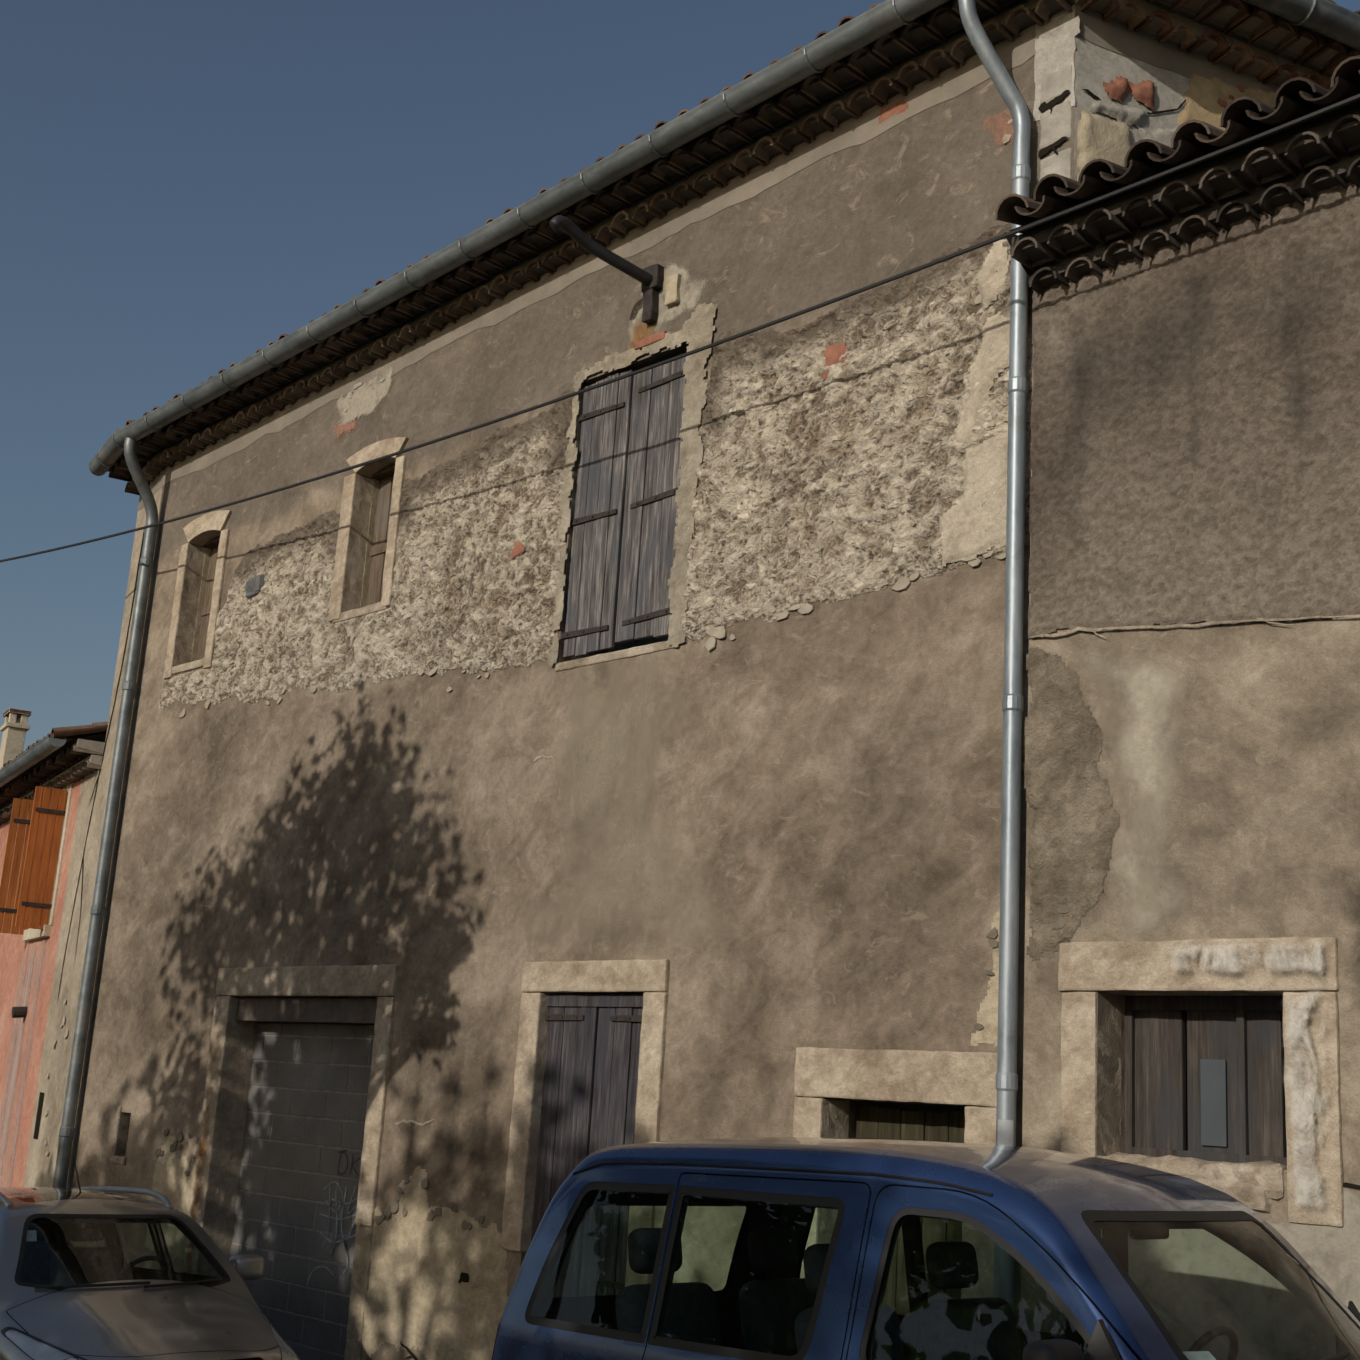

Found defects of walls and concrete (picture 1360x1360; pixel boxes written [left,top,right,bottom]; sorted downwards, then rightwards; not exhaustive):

peeling [1077,74,1275,181]
peeling [629,264,705,341]
flaking render [335,366,393,436]
peeling [681,223,1011,651]
peeling [1024,277,1034,546]
peeling [158,390,575,718]
crack [1029,615,1360,638]
peeling [361,1166,508,1360]
crack [400,1342,417,1360]